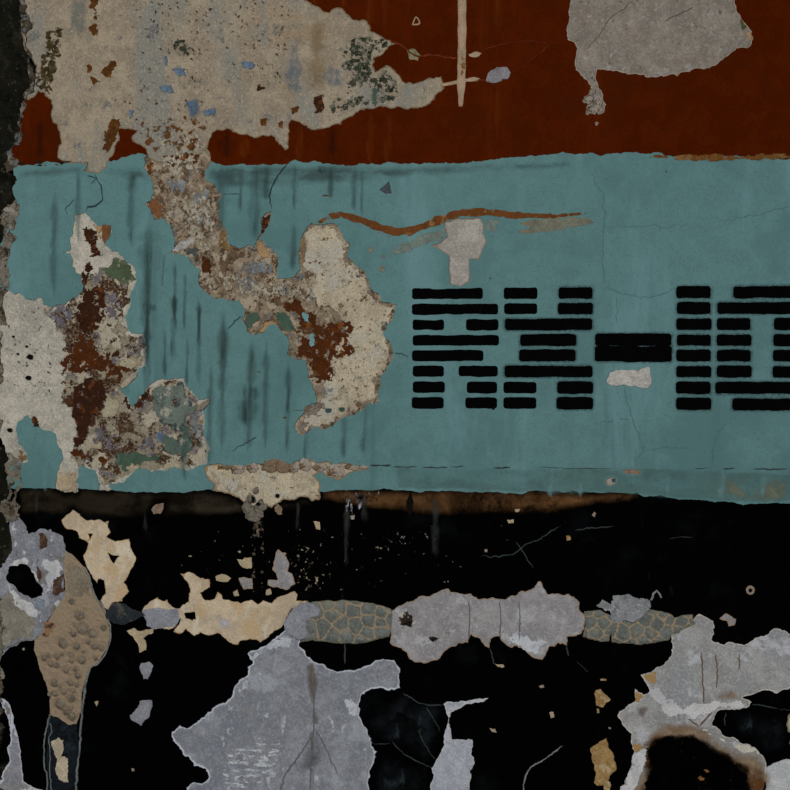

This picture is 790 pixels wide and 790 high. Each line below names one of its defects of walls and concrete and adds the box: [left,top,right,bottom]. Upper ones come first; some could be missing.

flaking render [566,0,753,126]
peeling [4,0,444,436]
rust [317,208,594,272]
peeling [0,199,400,790]
flaking render [390,581,585,663]
flaking render [590,613,790,790]